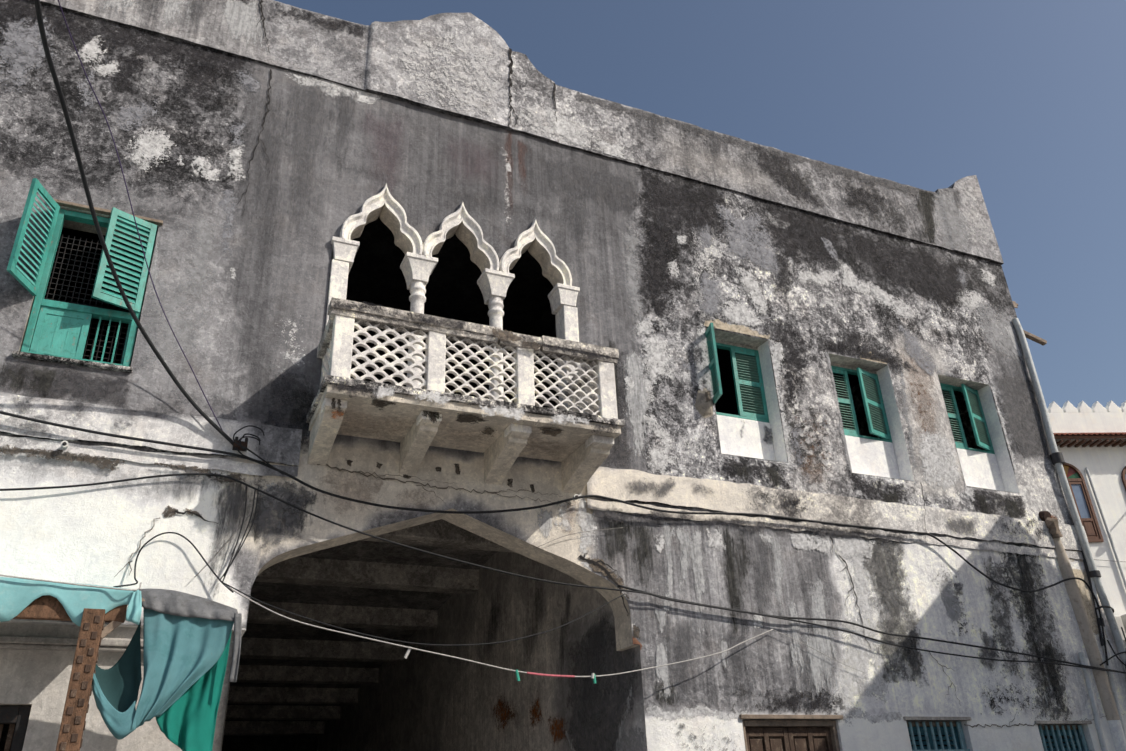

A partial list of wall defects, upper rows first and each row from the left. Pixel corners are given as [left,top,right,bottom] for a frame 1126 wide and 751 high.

water stain [98,48,146,102]
crack [239,0,272,216]
water stain [574,93,1050,457]
water stain [333,301,465,329]
water stain [0,361,130,433]
water stain [328,376,378,399]
water stain [971,489,1026,519]
crack [116,518,160,575]
water stain [594,457,926,718]
crack [839,555,871,648]
water stain [976,543,1072,721]